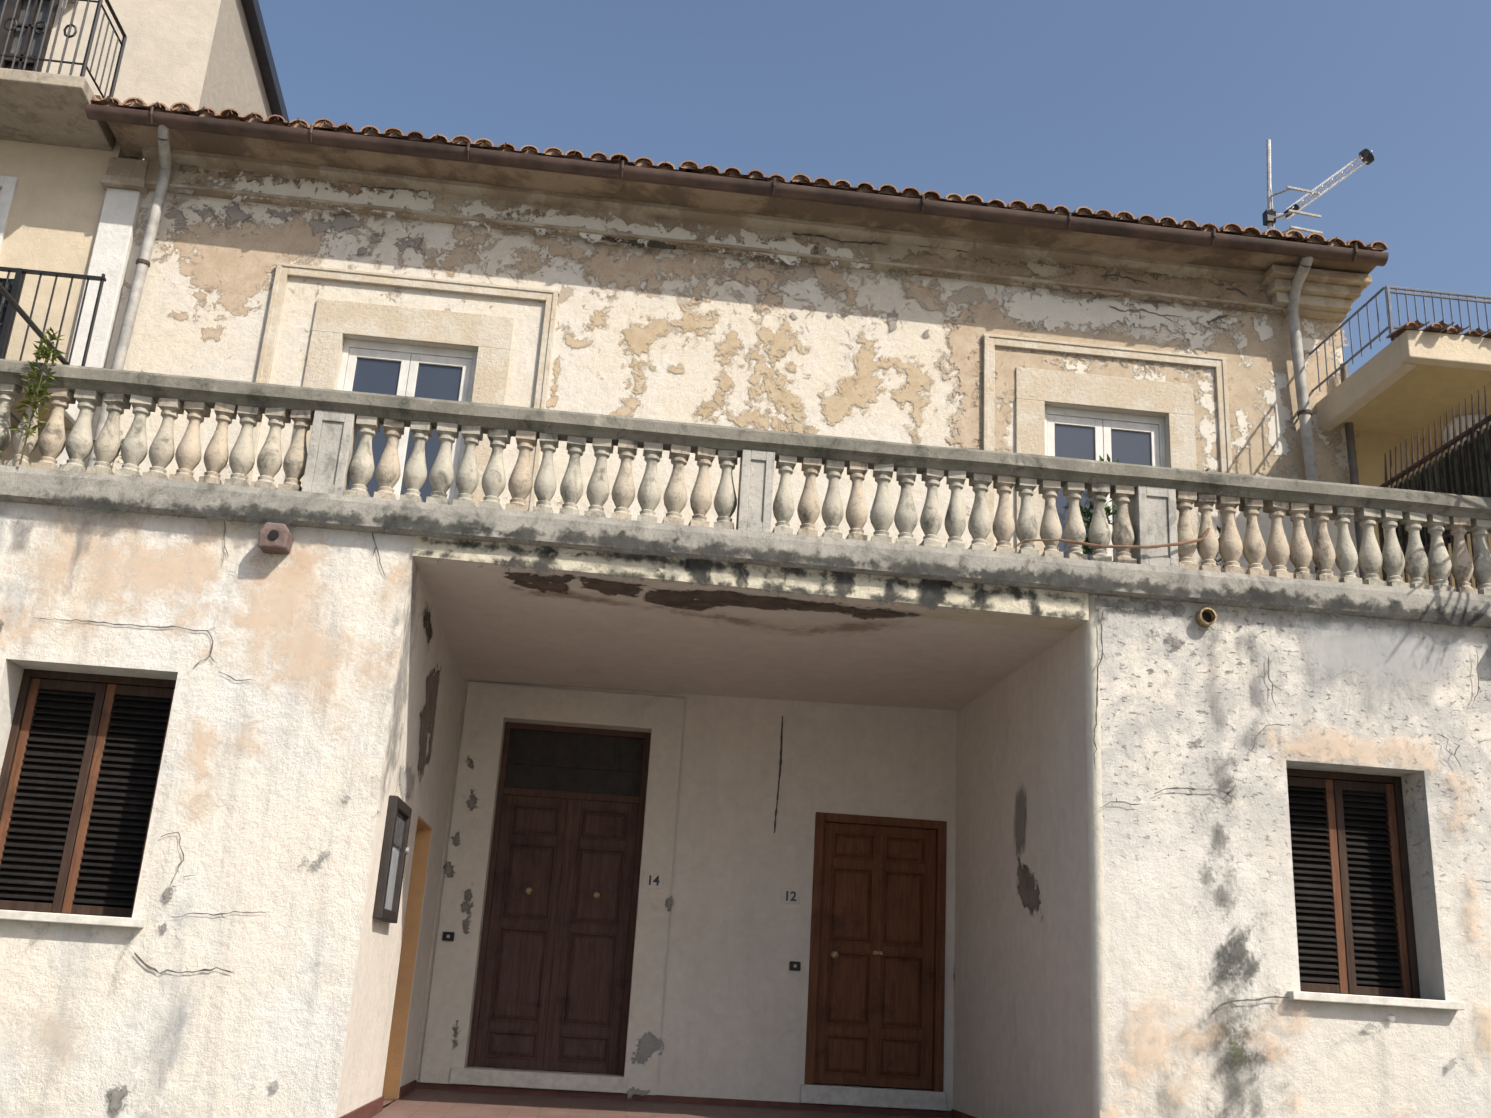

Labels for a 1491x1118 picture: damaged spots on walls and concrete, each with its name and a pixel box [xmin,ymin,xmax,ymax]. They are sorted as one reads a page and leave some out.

peeling [176,163,430,195]
peeling [155,197,1359,484]
damp [685,558,710,584]
damp [734,562,749,584]
damp [832,571,855,596]
damp [919,579,952,608]
crack [33,617,256,681]
peeling [418,668,440,779]
crack [160,832,266,919]
crack [134,953,234,974]
damp [1182,823,1278,1118]
spalling [631,1032,664,1064]